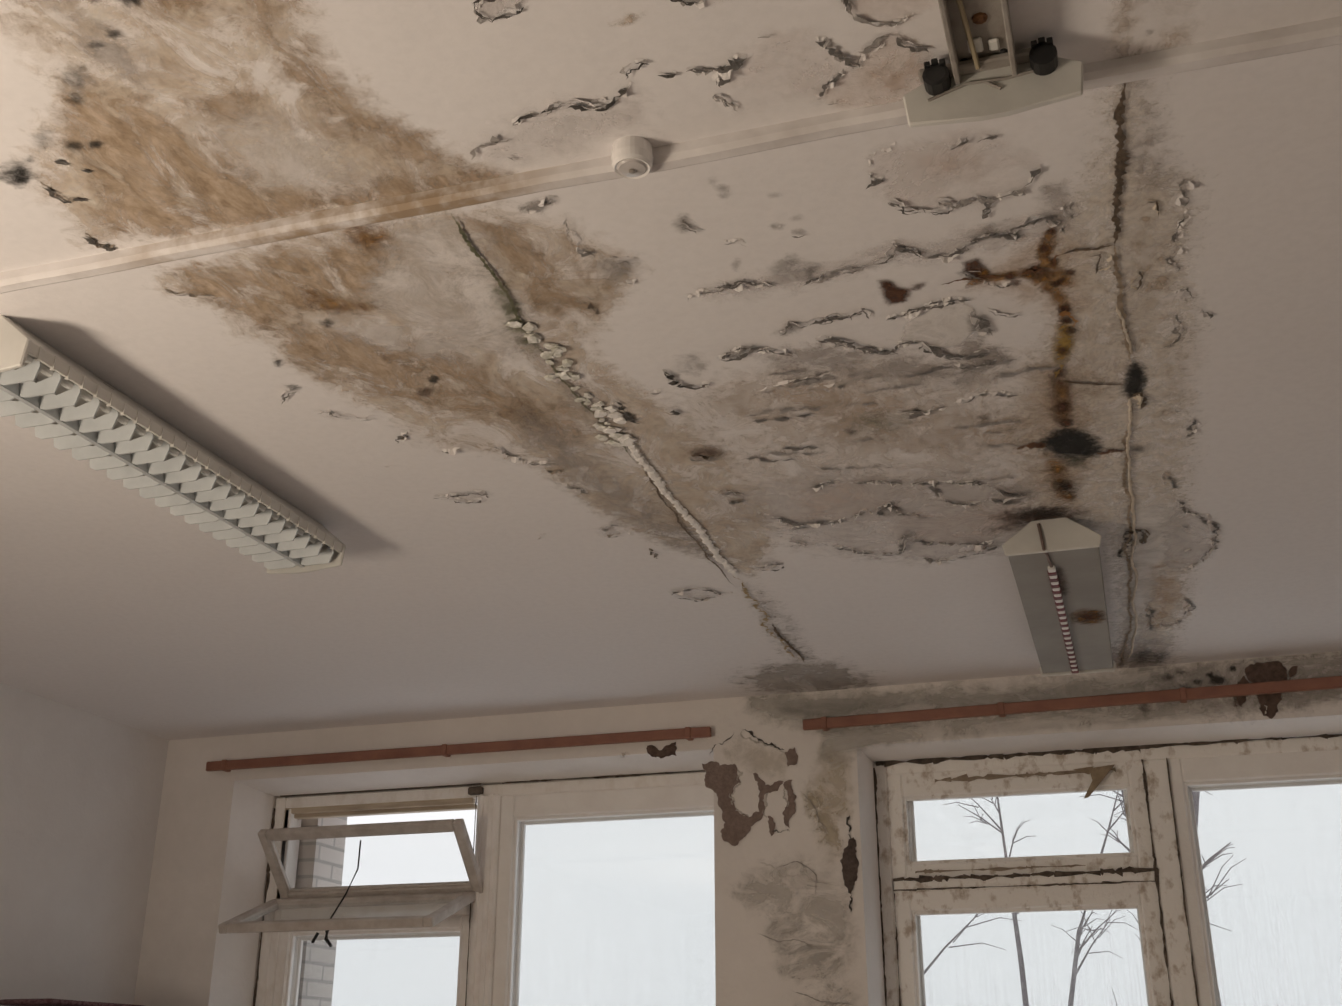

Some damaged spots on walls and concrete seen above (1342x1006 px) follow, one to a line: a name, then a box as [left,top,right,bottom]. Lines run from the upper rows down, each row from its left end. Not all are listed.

damp [0,0,499,251]
peeling [512,53,747,125]
damp [164,215,772,573]
crack [451,214,804,661]
peeling [687,82,1221,666]
rust [942,229,1078,427]
rust [1002,442,1076,527]
crack [1057,83,1138,664]
flaking render [702,731,798,846]
damp [804,791,840,846]
flaking render [840,815,859,911]
damp [740,641,1187,751]